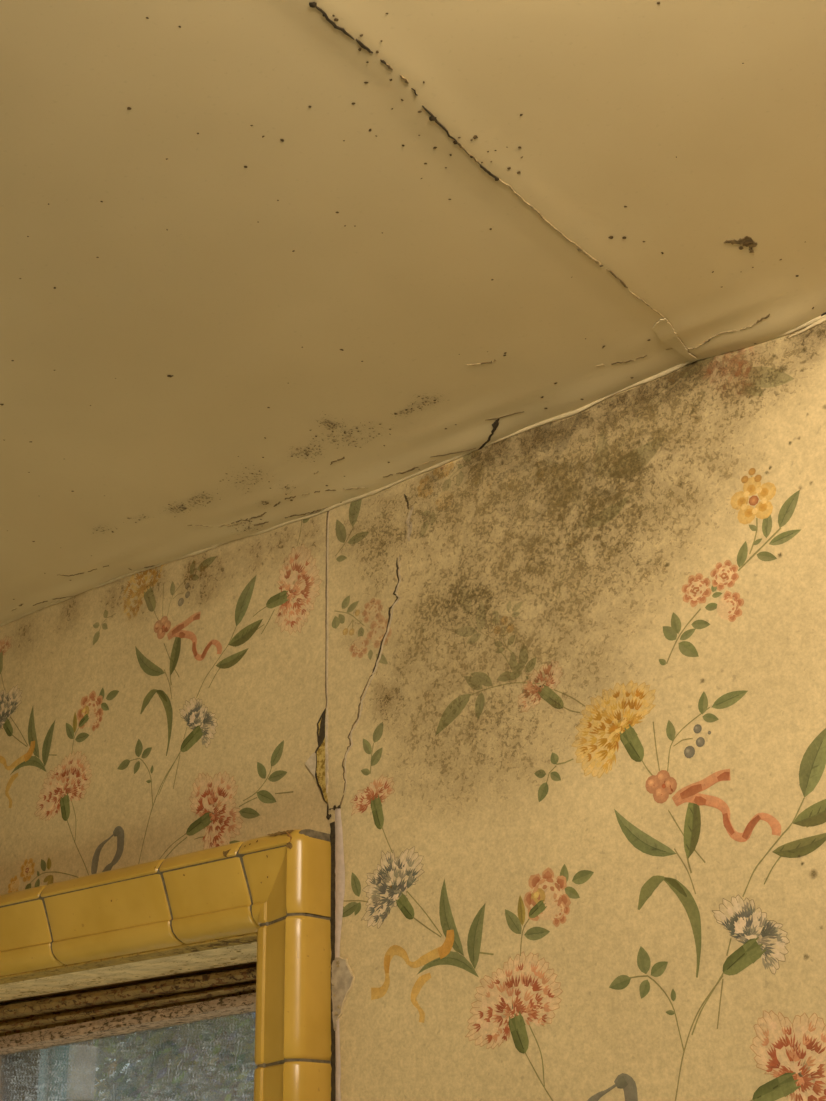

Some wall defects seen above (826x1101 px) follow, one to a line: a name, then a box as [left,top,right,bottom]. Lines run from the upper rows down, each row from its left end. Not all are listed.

crack [309,2,770,366]
crack [788,312,826,339]
crack [187,411,524,820]
water stain [353,349,790,788]